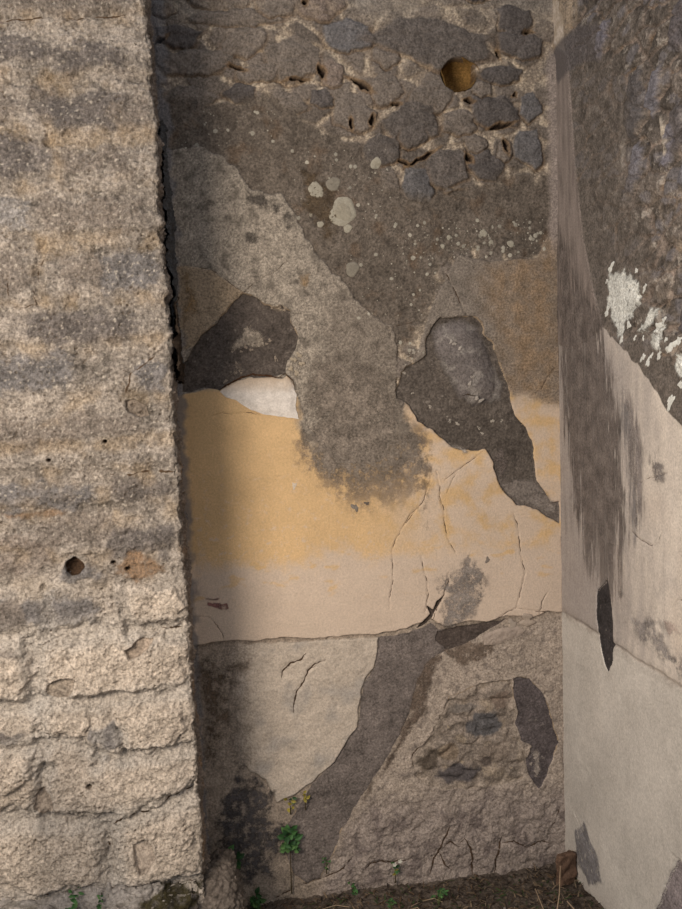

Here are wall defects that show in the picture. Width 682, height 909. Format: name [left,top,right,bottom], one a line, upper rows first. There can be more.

spalling [157,120,305,419]
peeling [640,317,682,366]
spalling [396,316,559,523]
crack [389,457,476,598]
crack [501,520,546,617]
leakage [199,660,247,758]
crack [281,653,325,712]
spalling [285,597,536,883]
spalling [411,677,559,790]
leakage [215,776,286,884]
spalling [656,860,682,909]